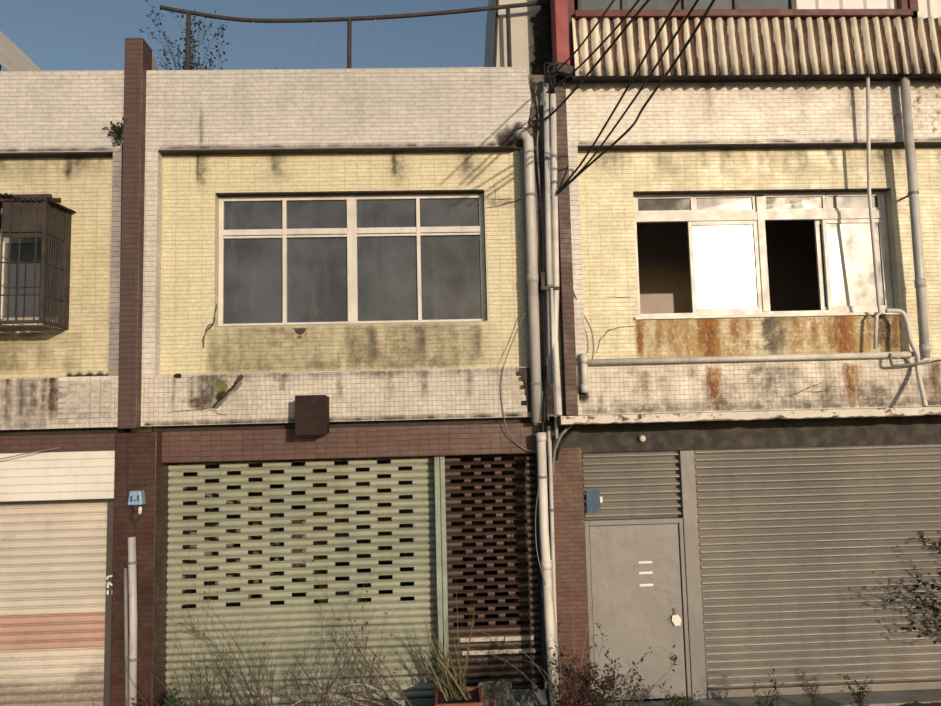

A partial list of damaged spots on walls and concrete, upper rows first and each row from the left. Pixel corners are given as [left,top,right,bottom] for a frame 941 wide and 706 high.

crack [202,304,217,348]
leakage [353,325,424,375]
rust [637,319,749,358]
rust [774,315,901,355]
rust [707,368,721,402]
rust [846,365,858,397]